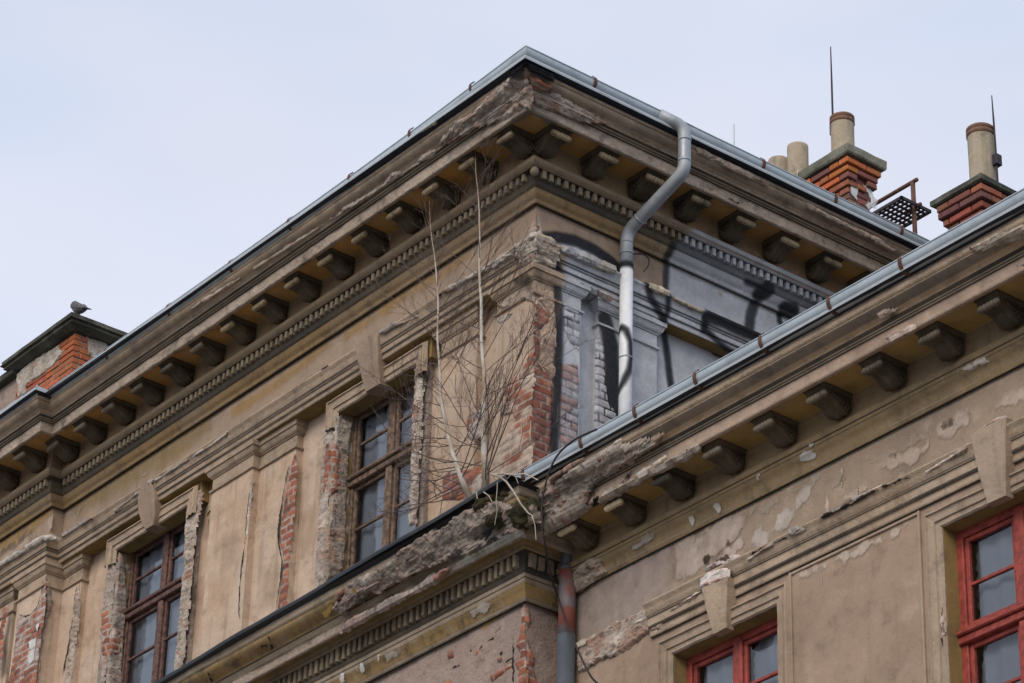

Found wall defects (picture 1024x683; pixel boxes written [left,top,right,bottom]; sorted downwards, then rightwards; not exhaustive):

spalling [253,62,608,270]
flaking render [0,580,53,683]
spalling [100,551,127,683]
spalling [174,482,213,670]
crack [238,479,254,617]
flaking render [276,455,298,609]
spalling [315,416,352,588]
spalling [408,369,426,527]
flaking render [443,279,616,504]
spalling [598,443,702,505]
peeling [573,476,819,674]
crack [819,477,910,519]